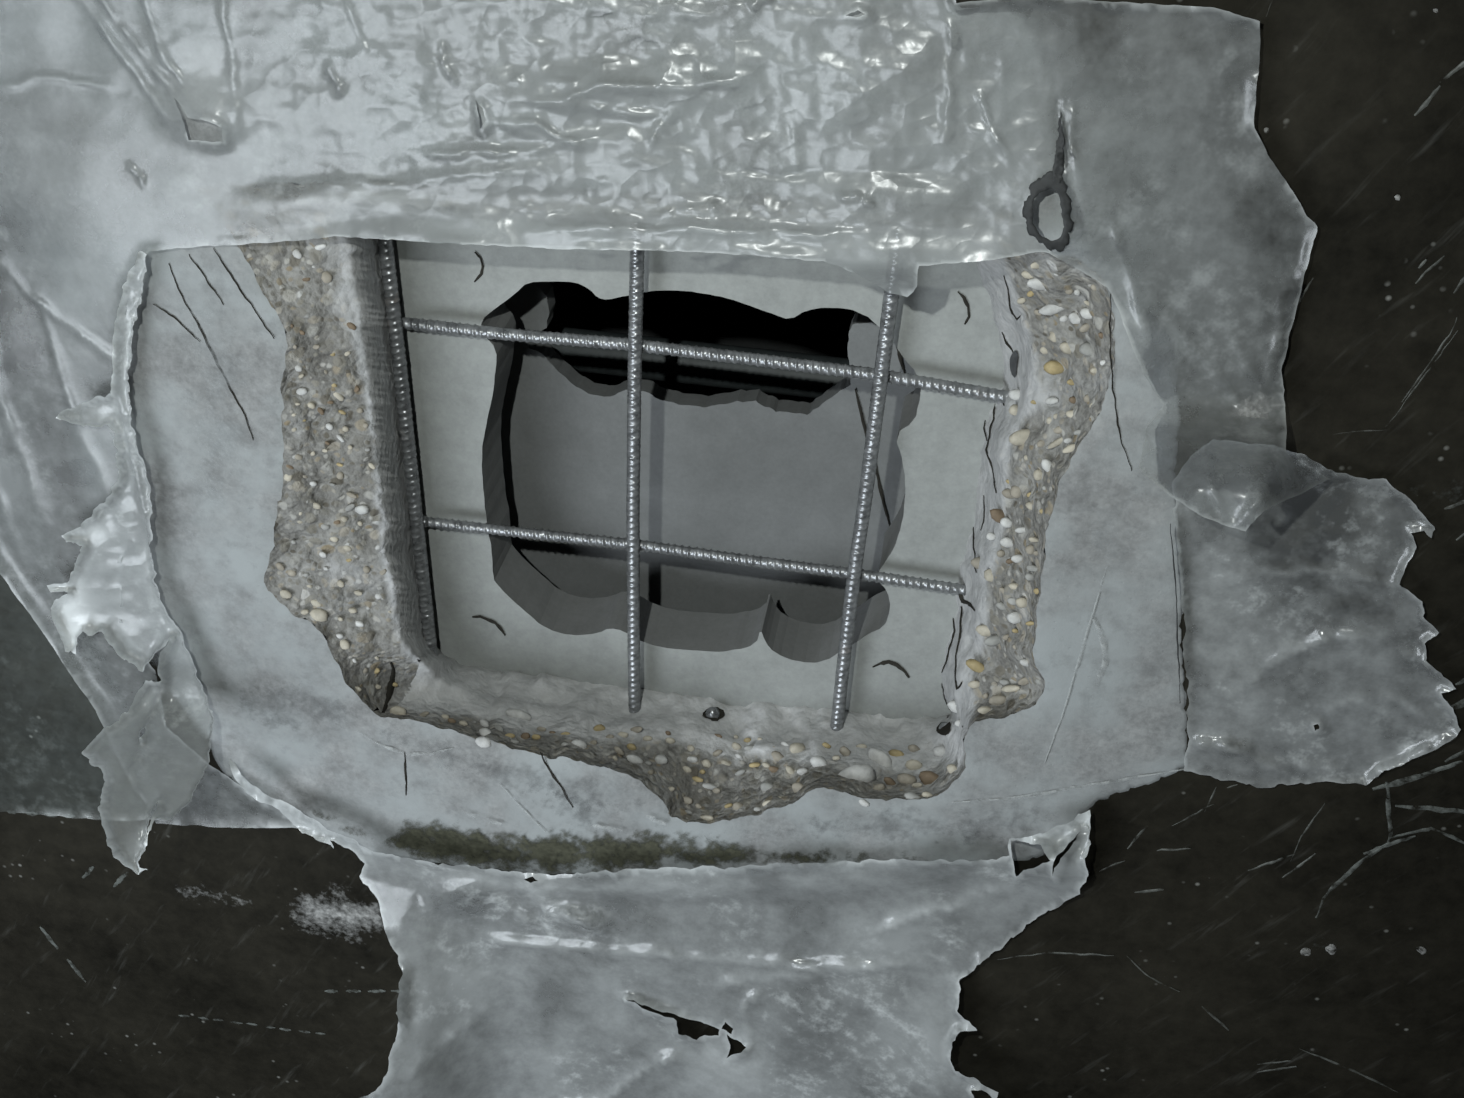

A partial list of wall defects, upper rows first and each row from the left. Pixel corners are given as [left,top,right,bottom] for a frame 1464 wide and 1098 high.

crack [153,248,274,440]
peeling [0,0,1188,878]
damp [388,791,755,873]
damp [773,852,830,865]